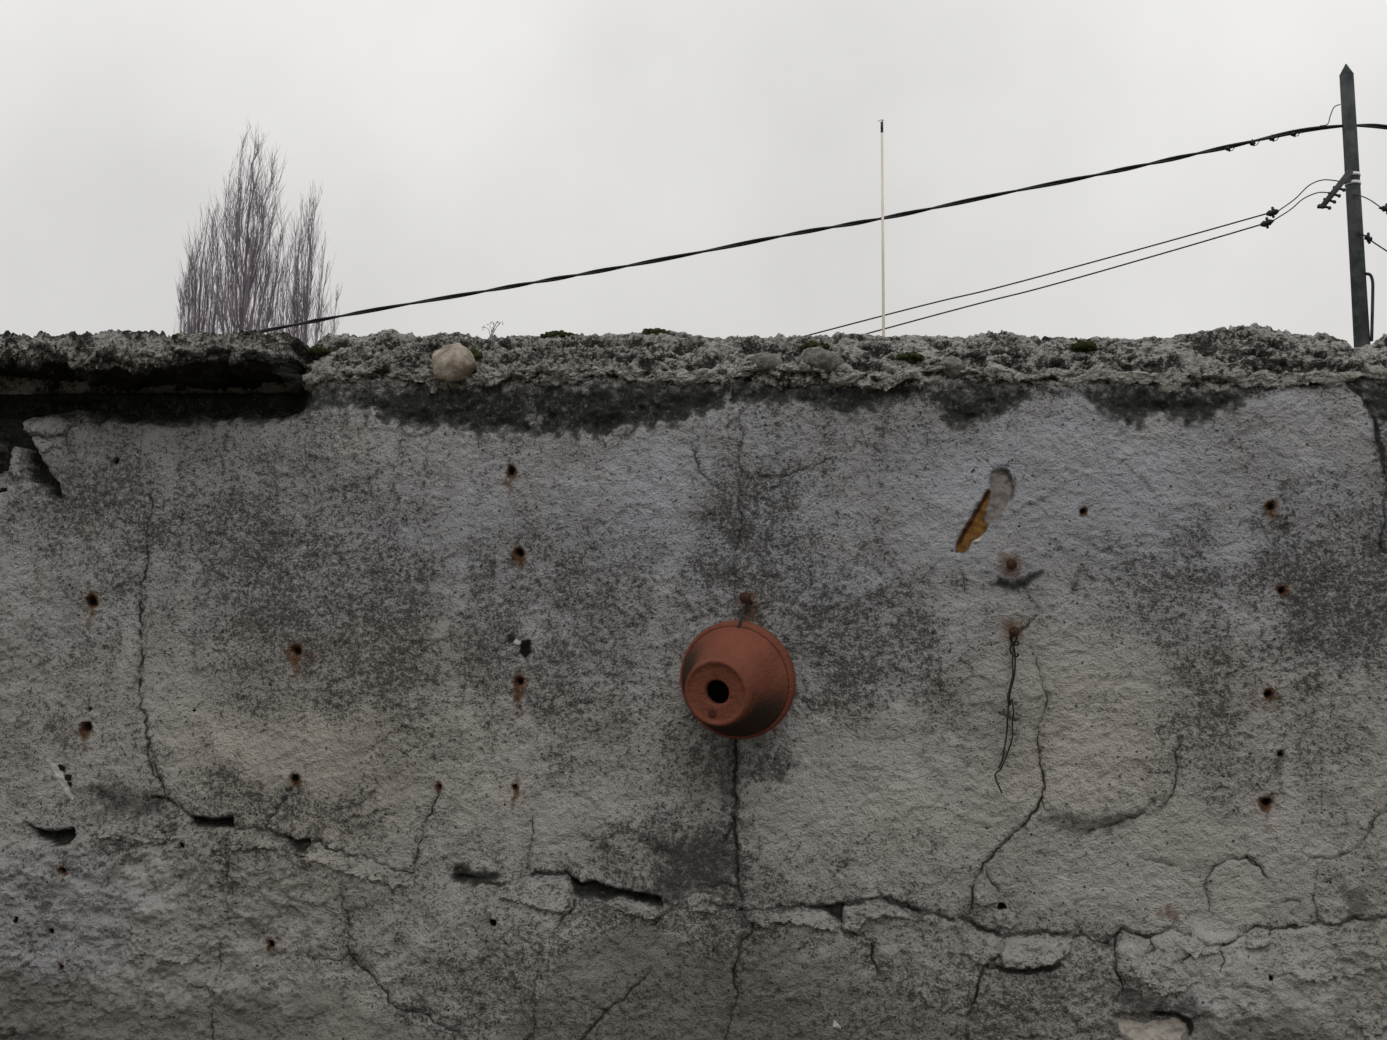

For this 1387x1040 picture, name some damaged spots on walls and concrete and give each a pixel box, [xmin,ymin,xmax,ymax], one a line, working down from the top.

water stain [94,380,1032,441]
crack [691,411,832,602]
flaking render [956,470,1013,553]
water stain [1084,384,1249,430]
crack [1345,381,1387,553]
water stain [1351,378,1387,422]
crack [138,496,439,1036]
crack [452,618,1387,1040]
crack [299,899,467,1040]
flaking render [1117,934,1222,1040]